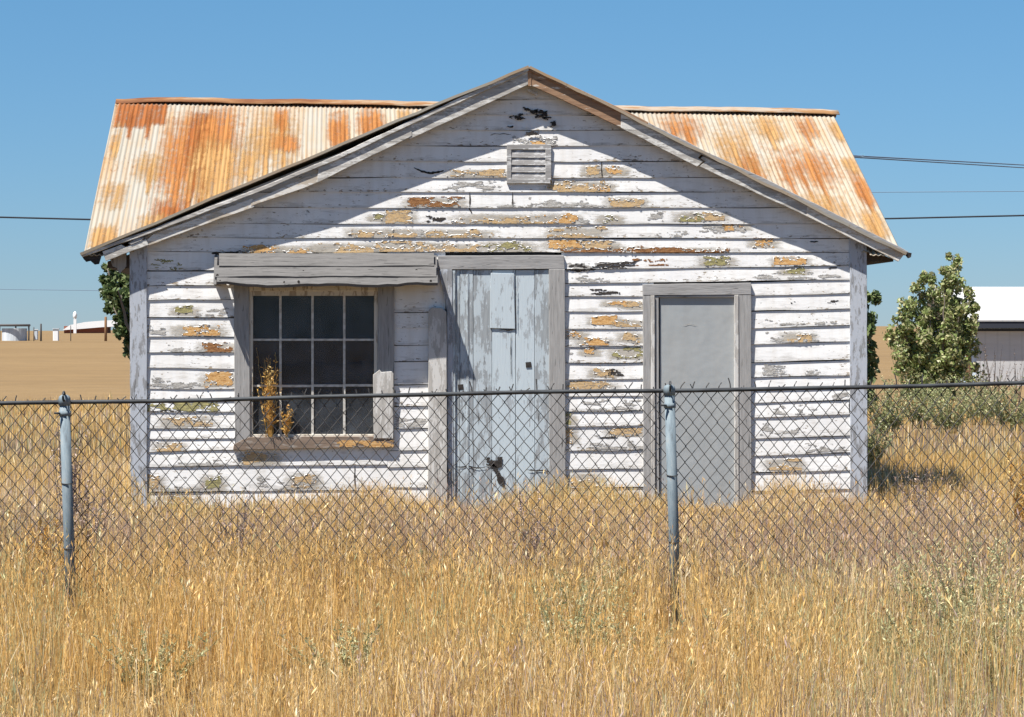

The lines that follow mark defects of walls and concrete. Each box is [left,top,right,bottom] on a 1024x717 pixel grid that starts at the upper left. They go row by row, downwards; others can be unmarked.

corrosion [110,103,297,227]
corrosion [328,109,383,146]
peeling [507,107,558,147]
corrosion [662,117,700,145]
corrosion [716,126,762,176]
corrosion [757,116,889,237]
corrosion [88,225,116,253]
peeling [242,165,841,410]
peeling [147,305,234,353]
peeling [147,371,234,389]
peeling [589,427,643,450]
peeling [767,439,847,471]